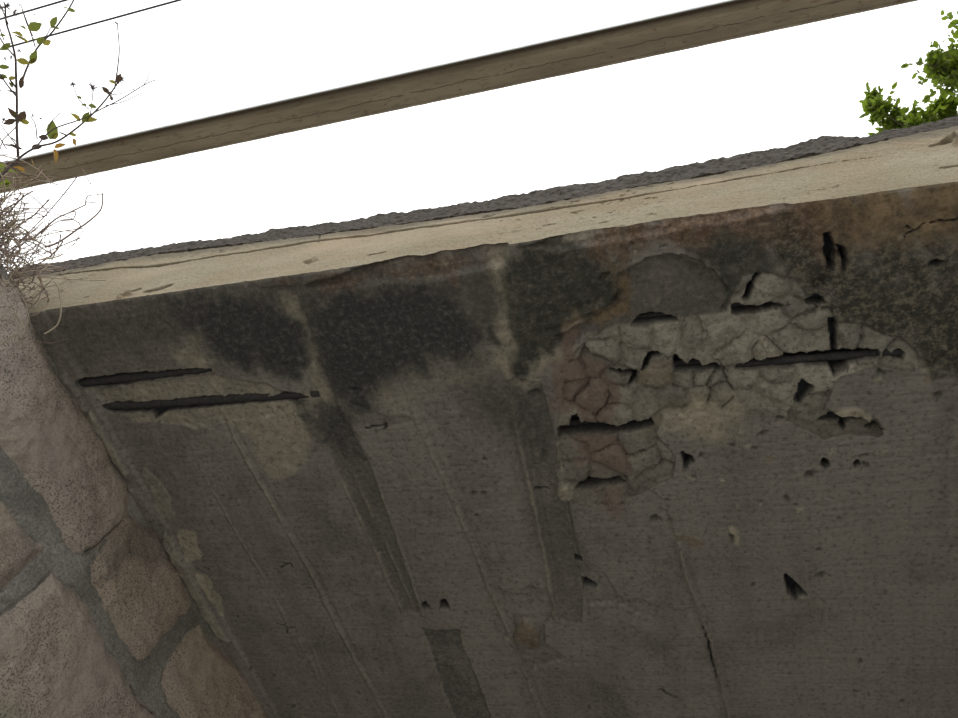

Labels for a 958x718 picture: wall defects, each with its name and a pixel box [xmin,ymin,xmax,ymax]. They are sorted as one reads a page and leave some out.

crack [904,217,958,238]
spalling [85,373,308,430]
water stain [27,247,570,488]
spalling [553,252,922,511]
hole [783,573,808,603]
peeling [419,628,493,718]
crack [702,626,719,680]